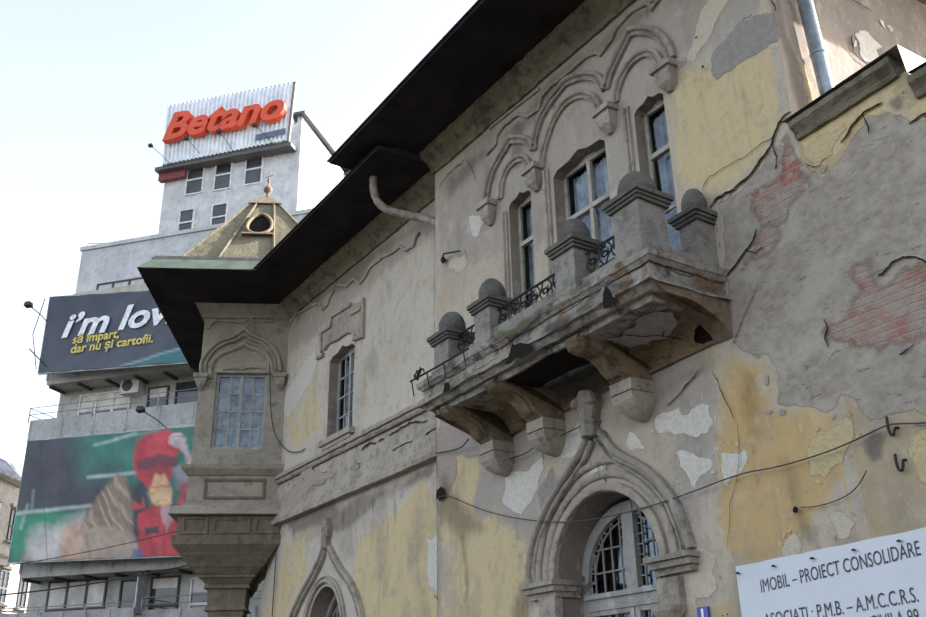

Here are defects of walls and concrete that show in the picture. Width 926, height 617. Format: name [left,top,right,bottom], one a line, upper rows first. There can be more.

peeling [677,0,779,79]
crack [840,101,882,143]
crack [909,112,926,124]
crack [703,110,791,207]
crack [662,229,763,283]
flaking render [715,90,926,484]
crack [877,254,926,276]
peeling [650,403,717,438]
crack [666,371,739,440]
peeling [501,420,582,515]
peeling [672,441,748,496]
peeling [426,533,438,599]